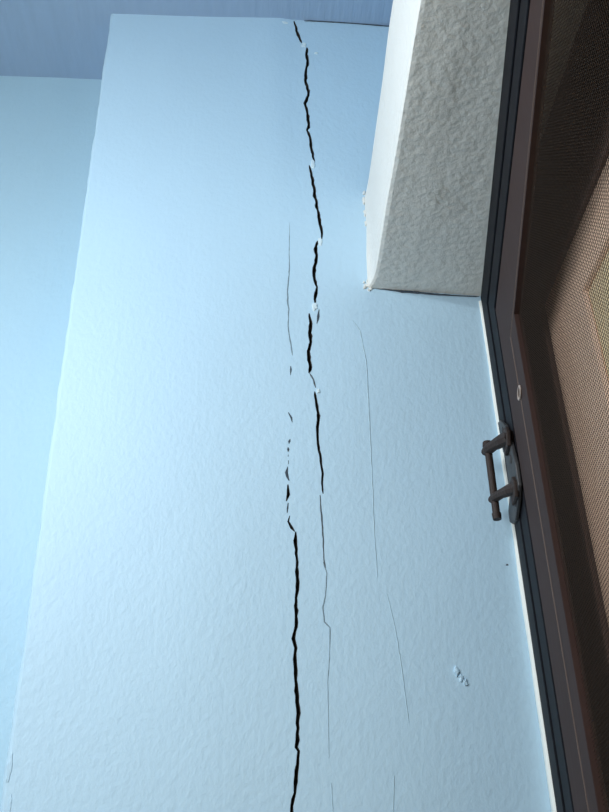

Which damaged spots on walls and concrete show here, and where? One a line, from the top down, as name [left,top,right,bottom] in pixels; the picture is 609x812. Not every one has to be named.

crack [285,412,301,812]
crack [282,20,389,684]